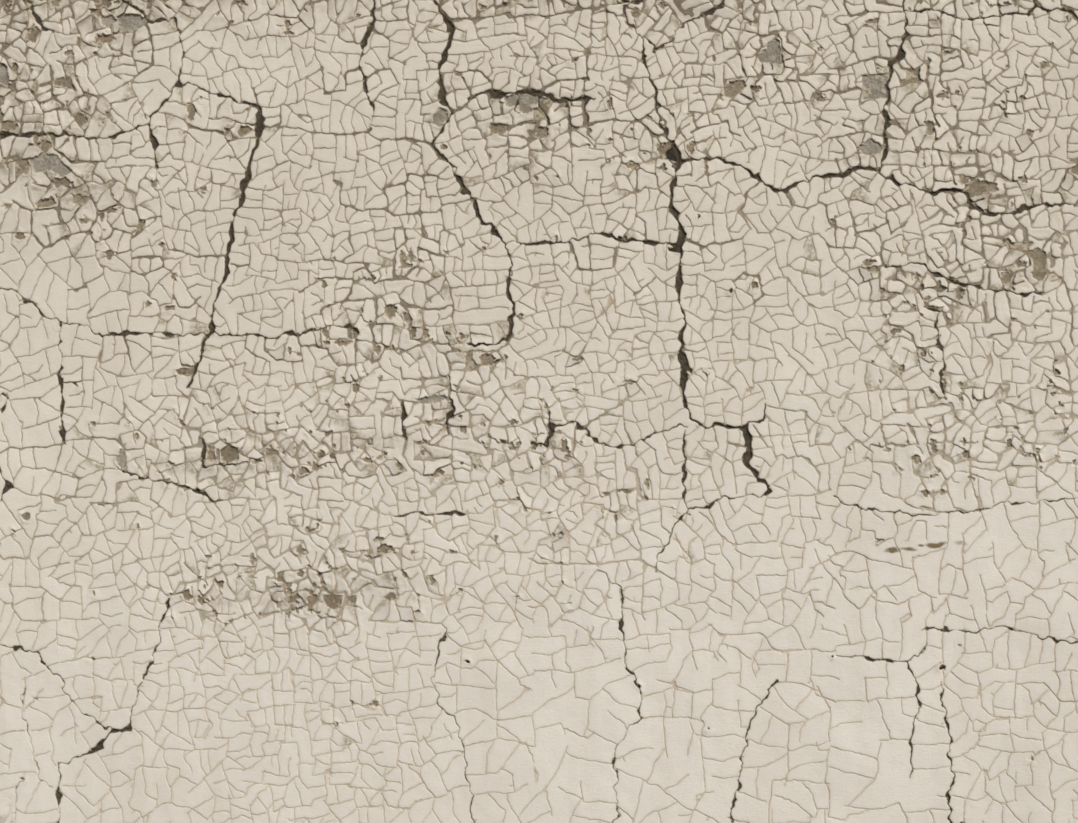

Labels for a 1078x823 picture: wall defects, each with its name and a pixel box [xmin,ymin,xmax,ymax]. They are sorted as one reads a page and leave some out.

peeling [0,0,169,260]
peeling [933,164,998,239]
peeling [1000,233,1048,291]
peeling [314,269,508,434]
peeling [479,386,583,470]
peeling [269,509,356,619]
crack [980,498,1078,634]
crack [43,772,64,814]
crack [36,612,162,739]
crack [596,695,678,823]
crack [698,625,915,823]
crack [1035,615,1078,664]